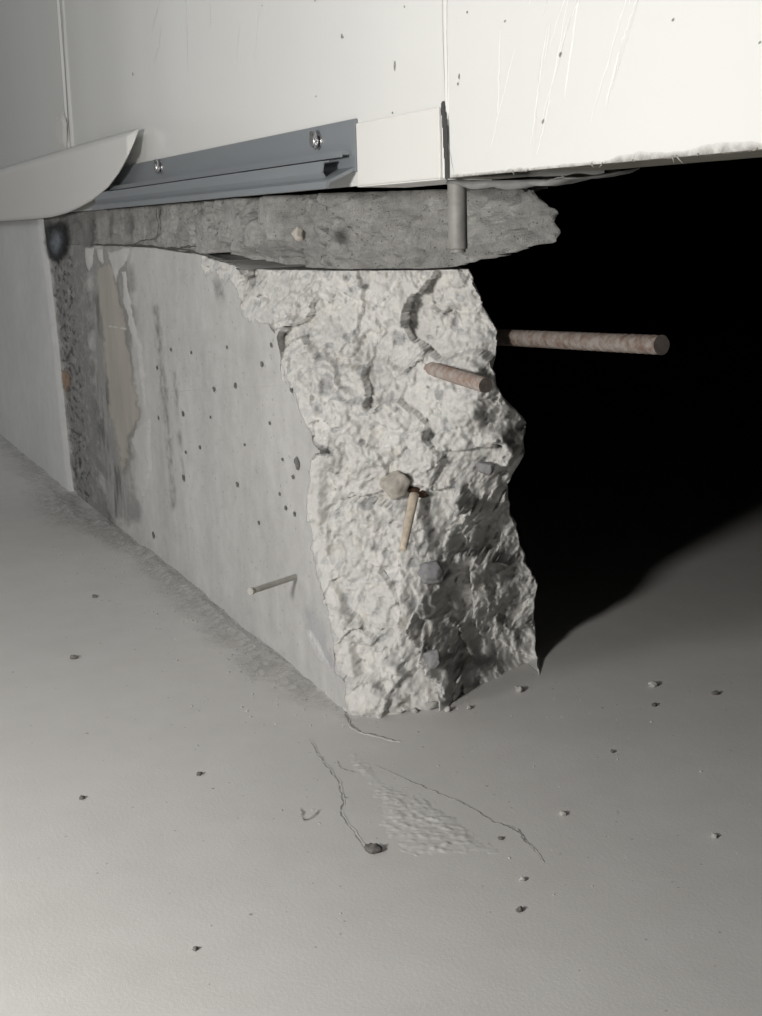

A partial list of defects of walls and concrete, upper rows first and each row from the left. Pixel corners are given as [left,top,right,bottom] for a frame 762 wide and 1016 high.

peeling [85,244,159,497]
spalling [201,255,670,718]
crack [343,710,401,742]
crack [311,740,544,862]